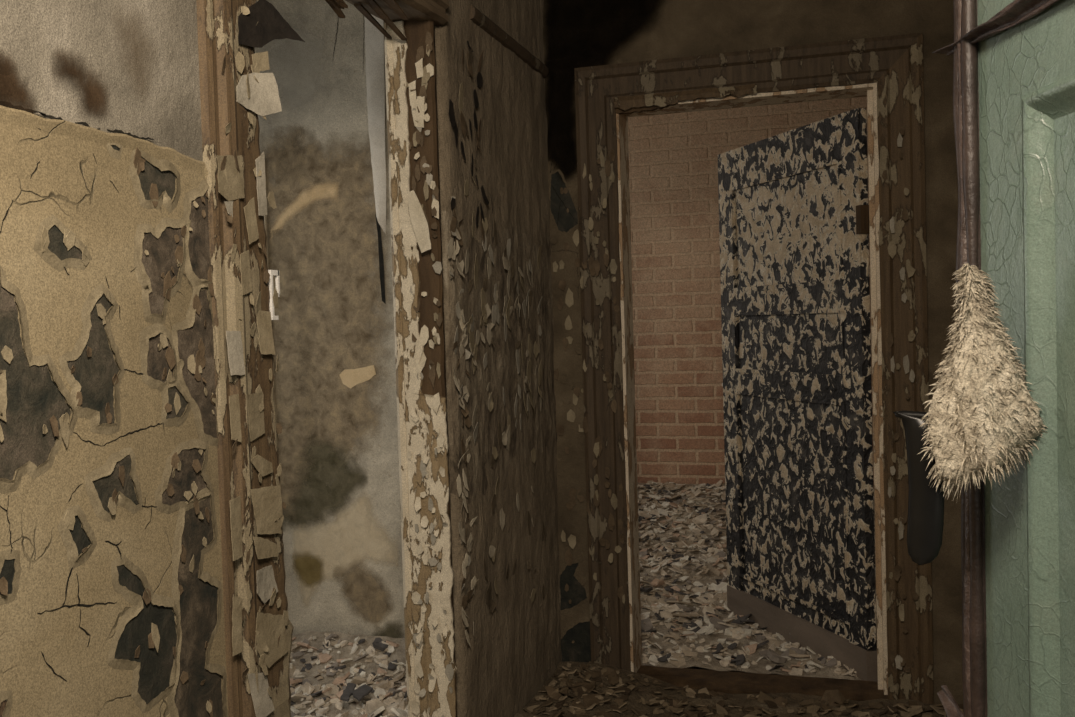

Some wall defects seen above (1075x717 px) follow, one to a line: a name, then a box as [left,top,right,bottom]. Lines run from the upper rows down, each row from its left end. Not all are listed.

damp [0,60,33,109]
damp [57,53,106,113]
peeling [222,0,305,125]
damp [547,63,577,179]
peeling [33,215,92,272]
peeling [0,265,125,494]
crack [74,423,164,446]
peeling [57,143,289,717]
damp [264,130,402,638]
peeling [393,31,624,663]
crack [0,495,13,552]
crack [38,567,116,647]